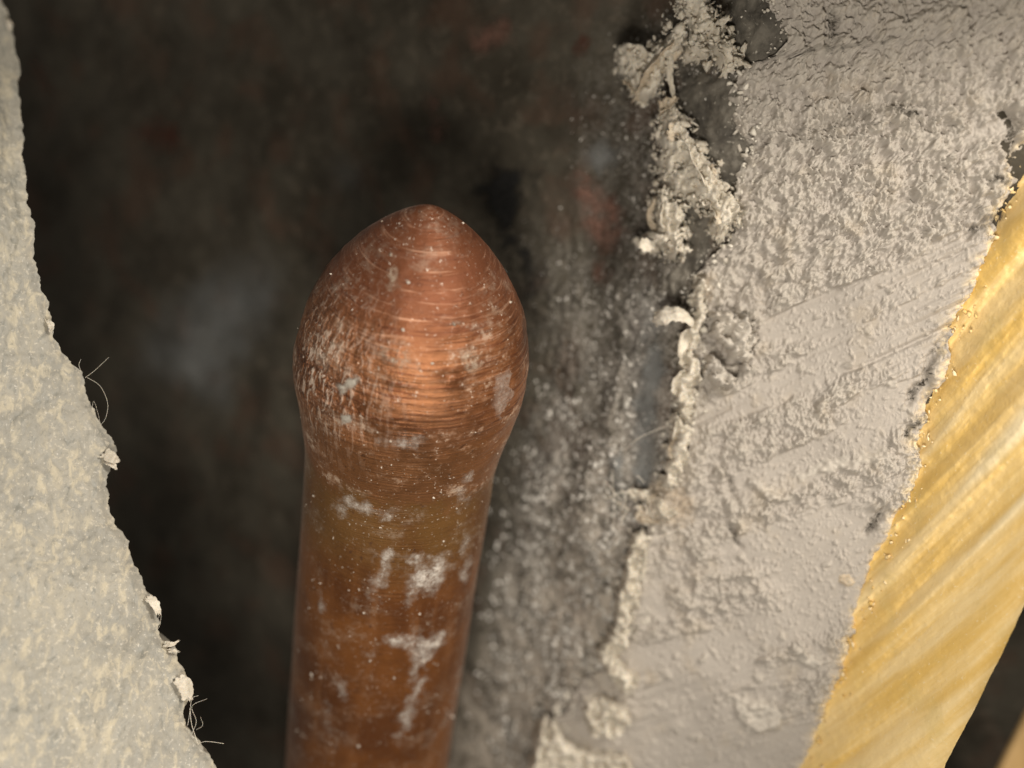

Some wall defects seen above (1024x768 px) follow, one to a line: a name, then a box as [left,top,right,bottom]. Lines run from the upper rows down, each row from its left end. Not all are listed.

peeling [614,0,787,491]